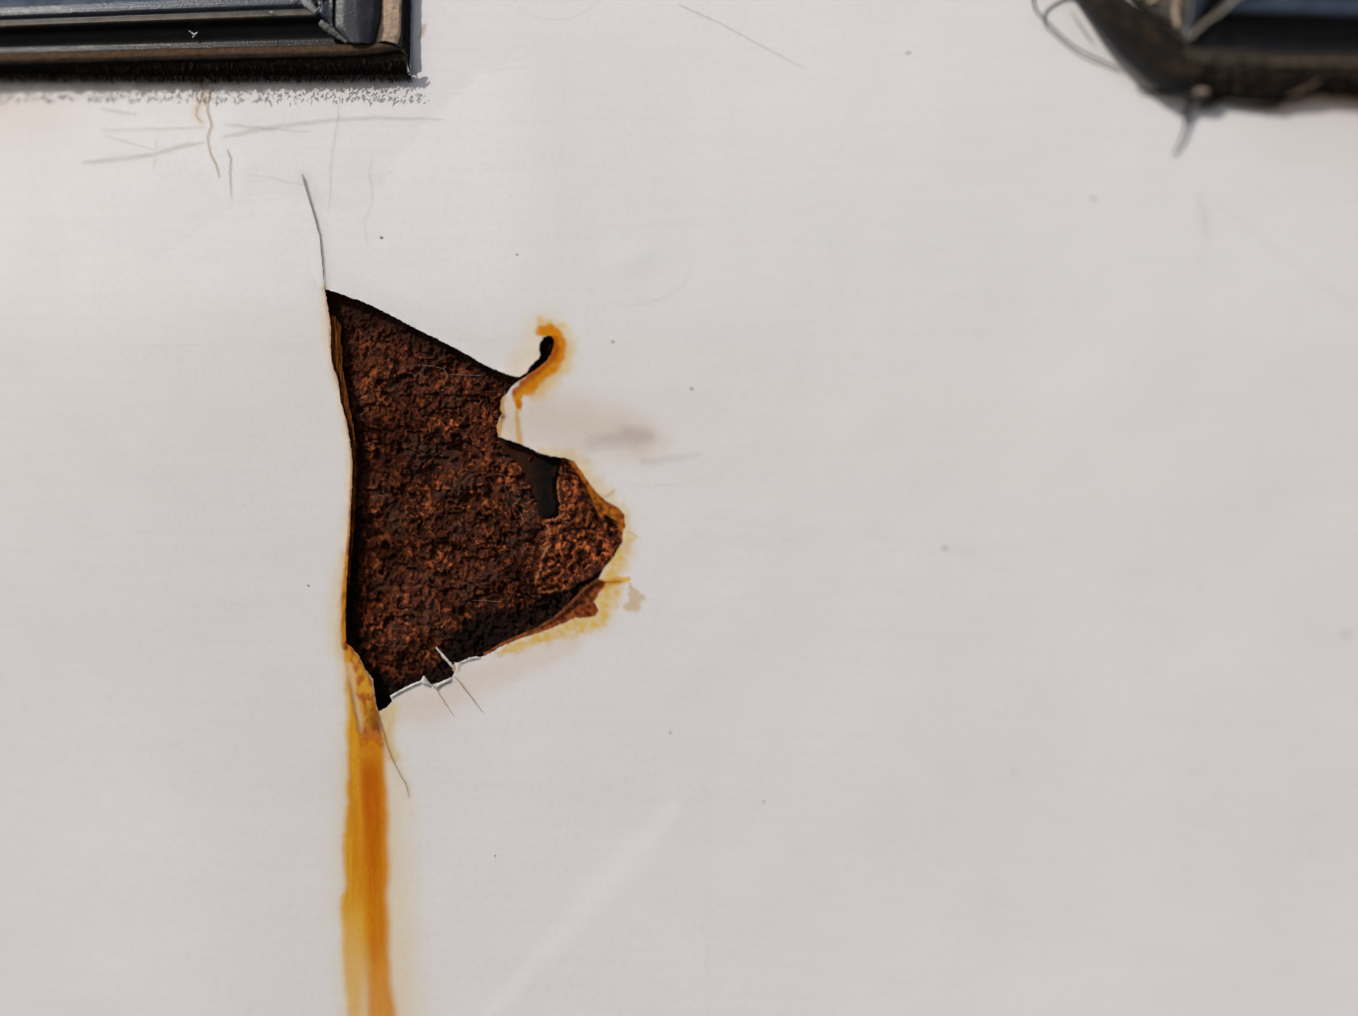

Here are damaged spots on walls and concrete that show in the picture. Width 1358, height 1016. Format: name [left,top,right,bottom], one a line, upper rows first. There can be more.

peeling [325,290,626,711]
rust [512,336,560,396]